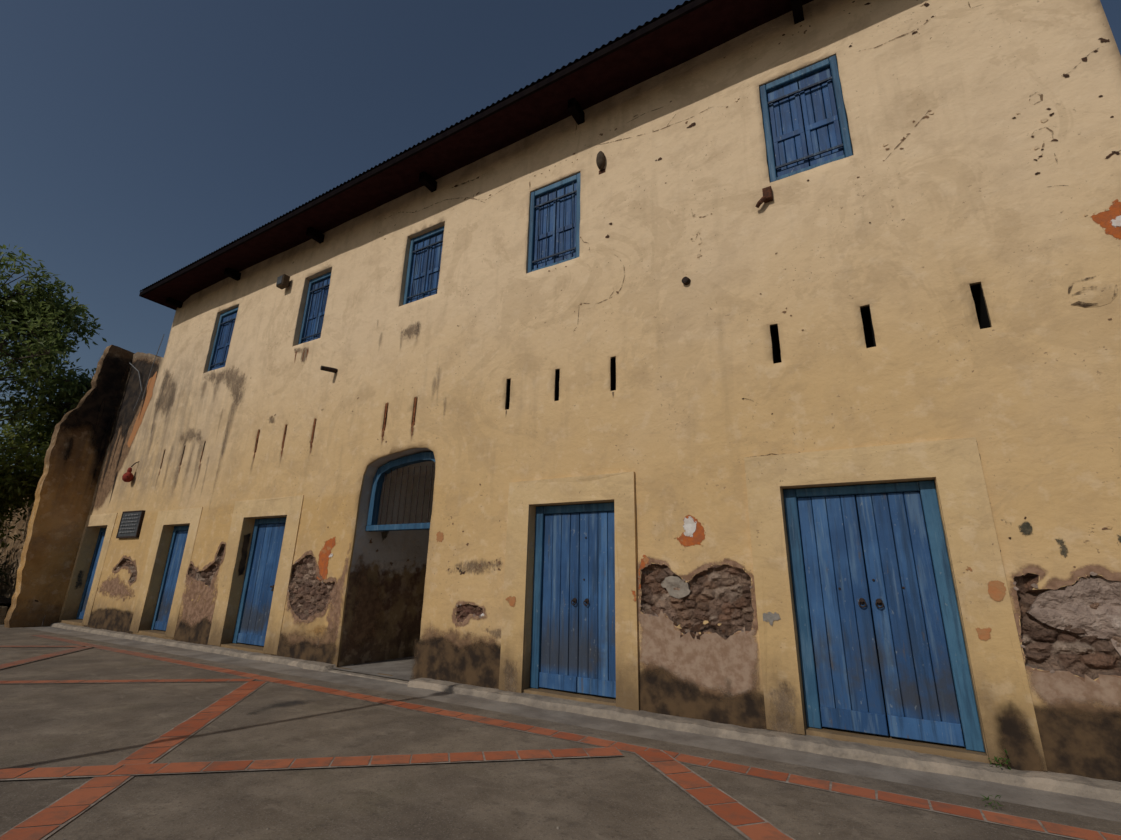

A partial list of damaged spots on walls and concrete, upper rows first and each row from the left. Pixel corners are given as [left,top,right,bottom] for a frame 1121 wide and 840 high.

peeling [1084,199,1121,239]
leakage [204,369,244,401]
peeling [674,515,706,547]
flaking render [97,555,137,601]
flaking render [182,542,226,626]
flaking render [287,527,337,623]
flaking render [452,601,486,626]
flaking render [632,555,781,696]
peeling [976,628,991,641]
flaking render [988,565,1121,706]
leakage [639,662,794,733]
leakage [997,698,1121,782]